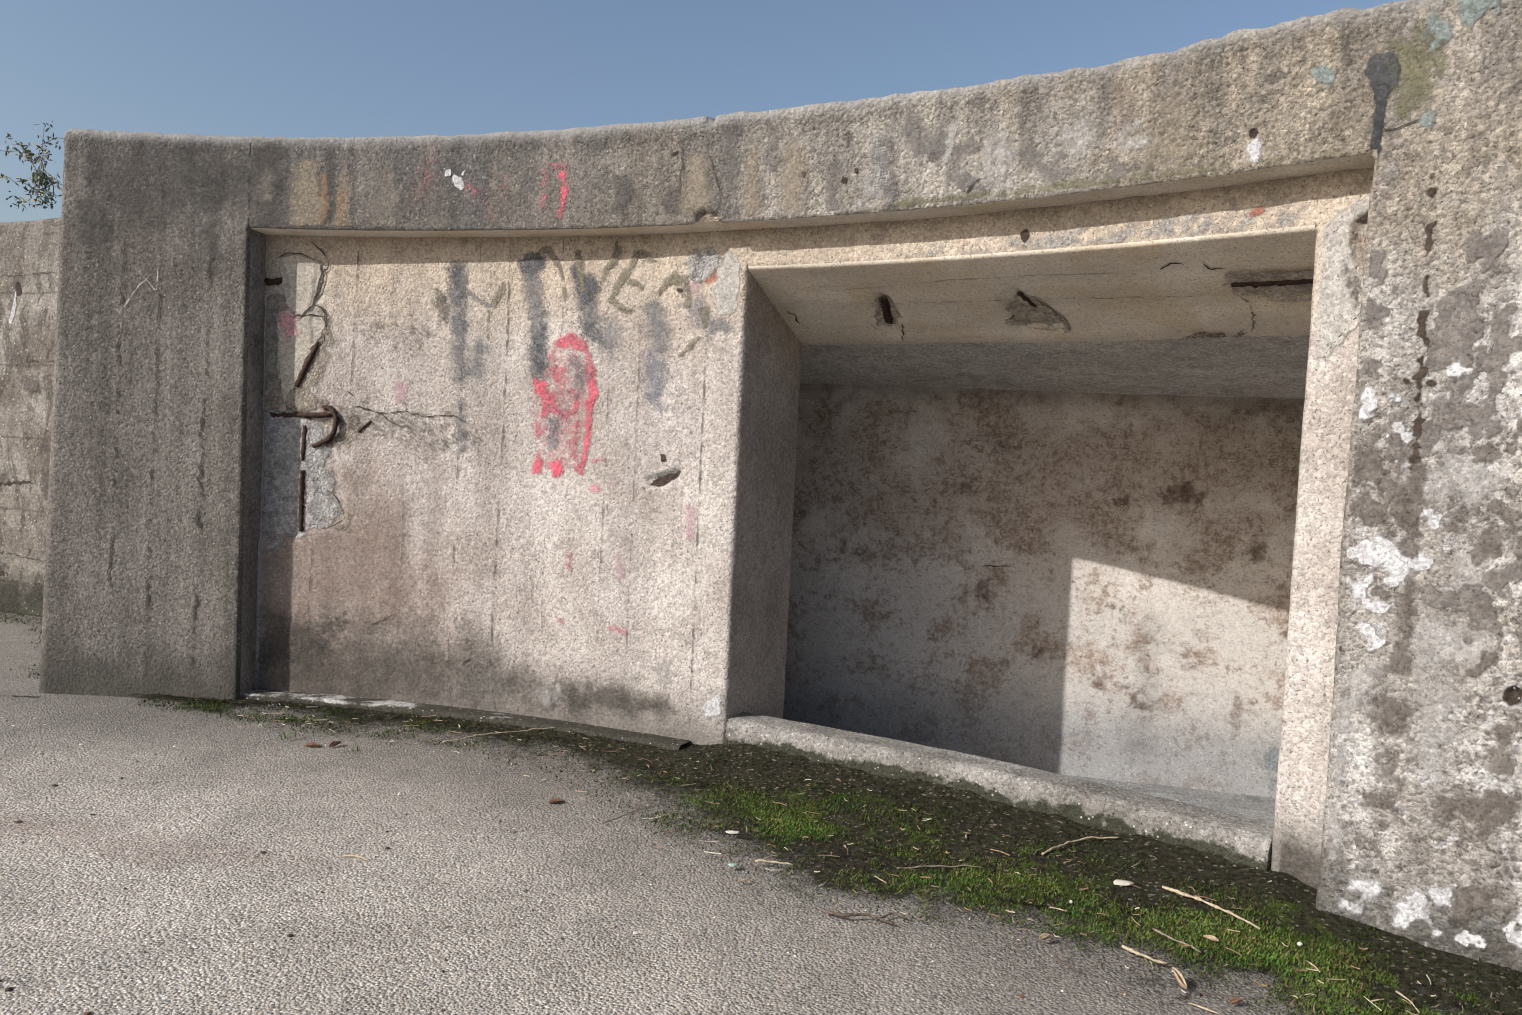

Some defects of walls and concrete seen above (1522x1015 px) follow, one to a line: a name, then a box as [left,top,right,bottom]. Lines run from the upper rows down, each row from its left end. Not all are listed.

crack [1379,119,1436,132]
spalling [1225,270,1314,302]
spalling [875,297,904,340]
spalling [1006,291,1070,334]
crack [1402,176,1439,473]
spalling [262,254,487,550]
crack [343,391,474,428]
spalling [649,454,681,487]
damp [1397,461,1426,558]
damp [260,615,675,713]
damp [1371,580,1419,719]
damp [703,694,721,718]